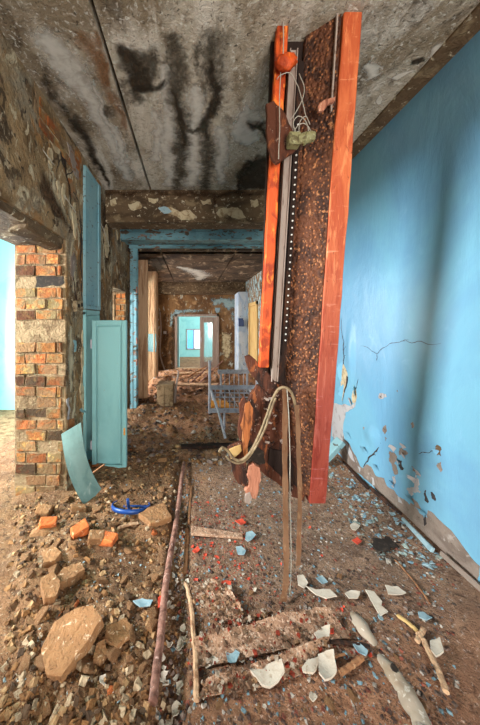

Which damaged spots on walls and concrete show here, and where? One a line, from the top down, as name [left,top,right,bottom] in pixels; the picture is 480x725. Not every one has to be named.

damp [36,31,266,281]
peeling [128,198,196,221]
peeling [216,207,246,219]
peeling [211,298,235,322]
peeling [221,332,231,358]
peeling [332,361,480,581]